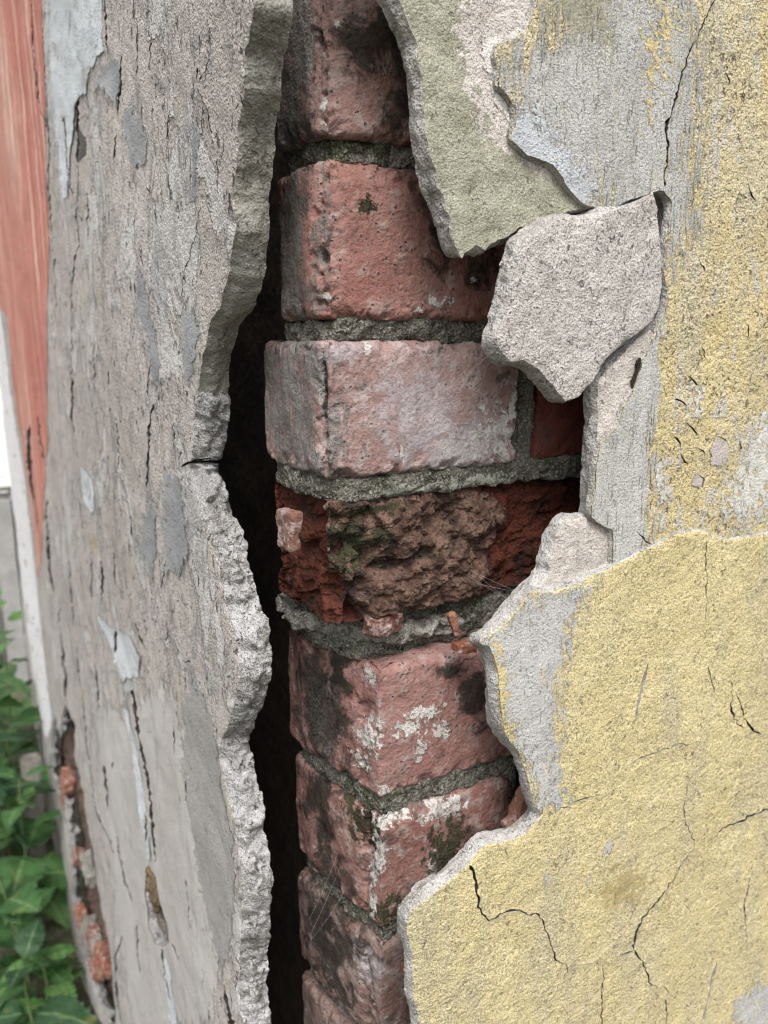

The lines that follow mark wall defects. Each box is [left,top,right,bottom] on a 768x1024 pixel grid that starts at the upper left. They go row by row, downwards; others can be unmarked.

crack [32,12,120,465]
crack [104,0,152,111]
peeling [476,0,723,287]
crack [663,0,715,186]
crack [26,417,168,901]
peeling [60,616,236,1024]
crack [146,370,175,486]
crack [181,458,212,467]
damp [298,656,451,774]
spalling [275,303,678,823]
crack [469,791,768,1024]
crack [730,682,761,734]